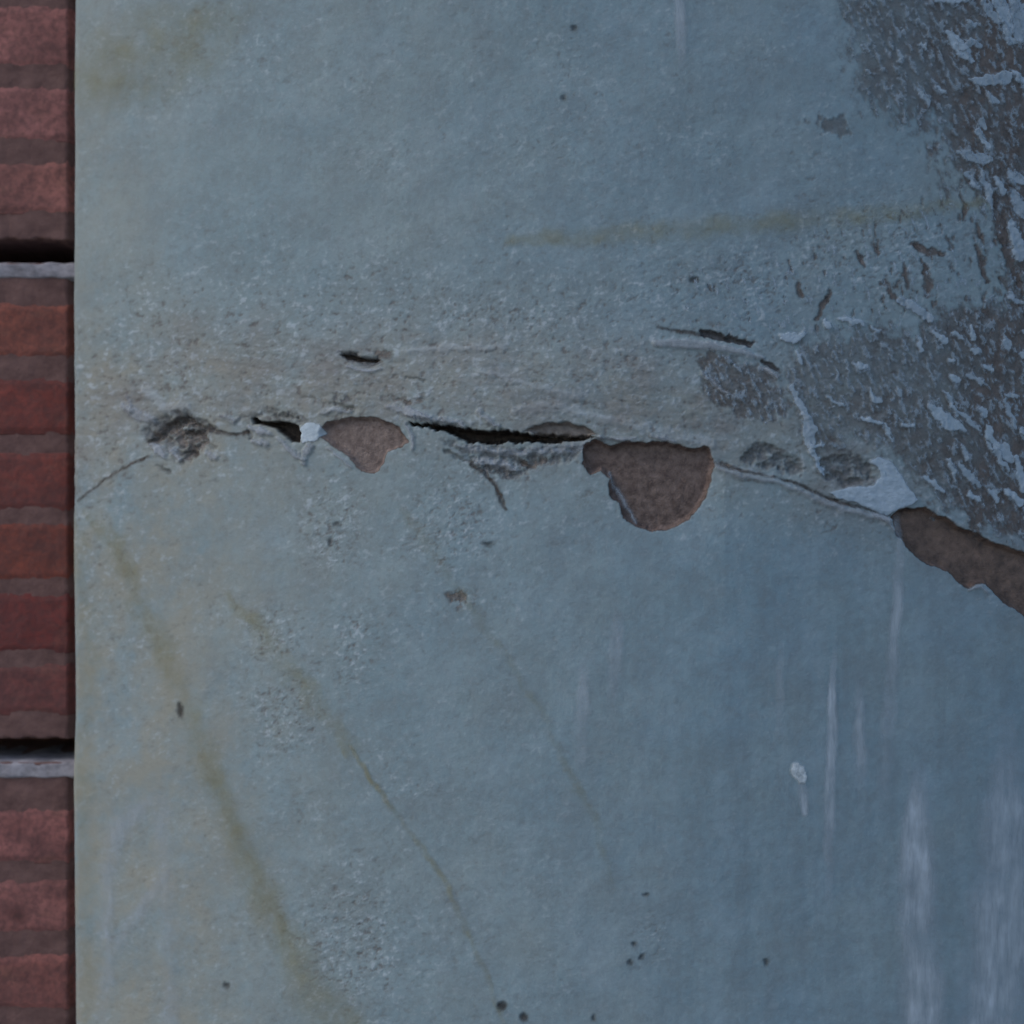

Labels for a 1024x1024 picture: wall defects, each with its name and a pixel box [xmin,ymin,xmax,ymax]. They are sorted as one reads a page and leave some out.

peeling [699,0,1024,616]
crack [80,404,310,499]
spalling [300,417,413,473]
crack [397,407,595,510]
spalling [582,437,714,532]
crack [720,463,890,516]